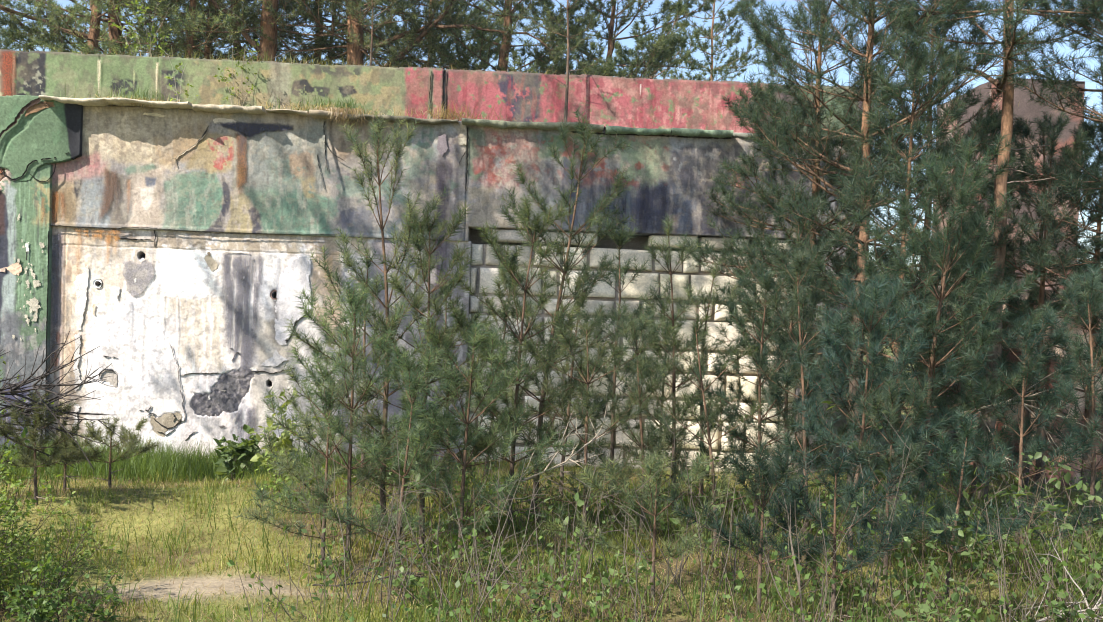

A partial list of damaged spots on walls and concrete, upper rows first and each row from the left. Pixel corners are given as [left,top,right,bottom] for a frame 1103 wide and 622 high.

crack [429,70,446,114]
crack [174,126,209,167]
crack [459,127,469,191]
peeling [0,239,44,332]
spalling [99,369,117,387]
spalling [108,258,154,300]
crack [45,225,337,447]
spalling [204,252,218,272]
peeling [150,257,311,437]
damp [224,254,261,371]